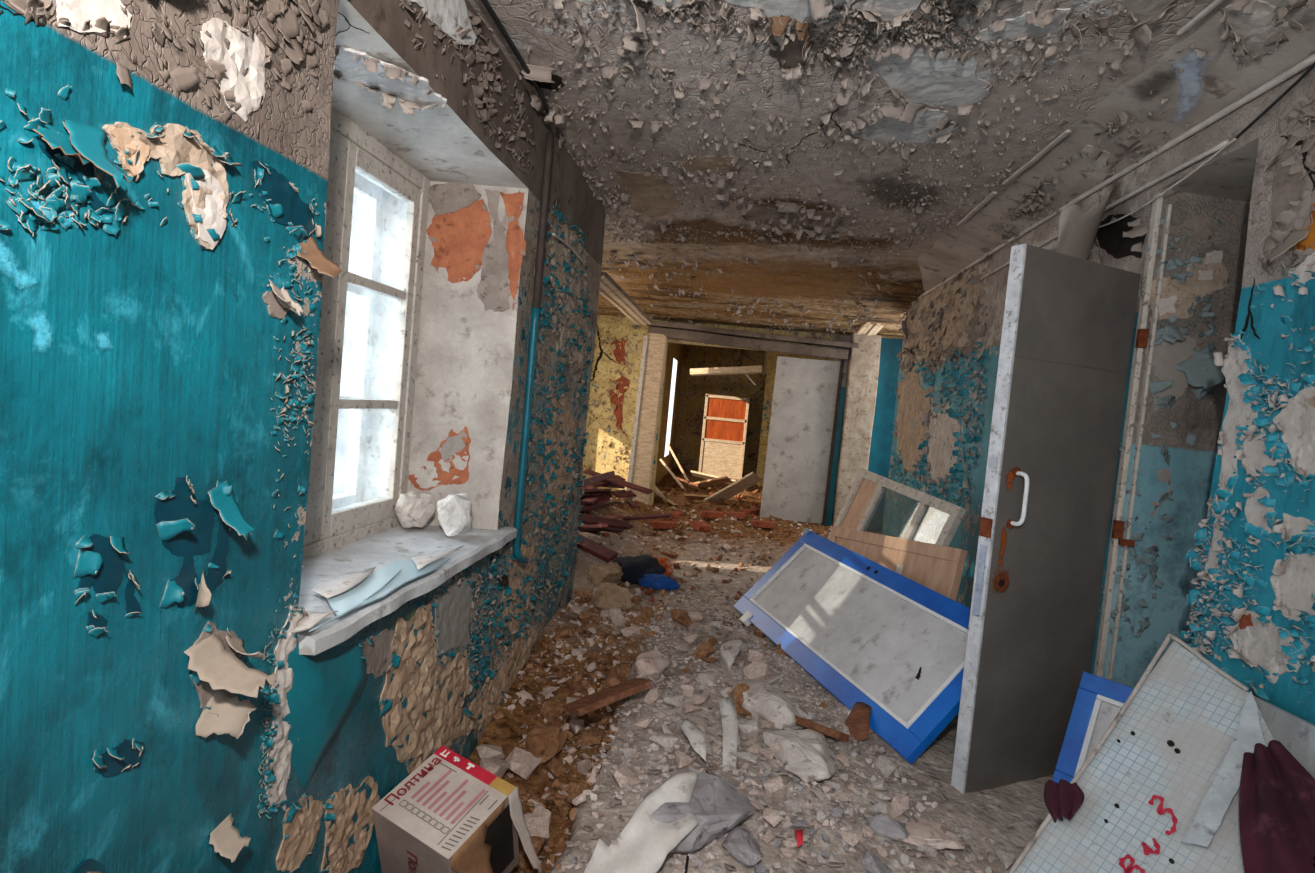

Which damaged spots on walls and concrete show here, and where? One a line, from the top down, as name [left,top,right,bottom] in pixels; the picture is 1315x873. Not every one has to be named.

water stain [756,198,833,211]
water stain [617,218,890,317]
peeling [888,254,993,508]
peeling [0,85,380,873]
spalling [359,181,631,775]
peeling [626,676,732,785]
peeling [798,707,881,825]
peeling [751,831,845,873]